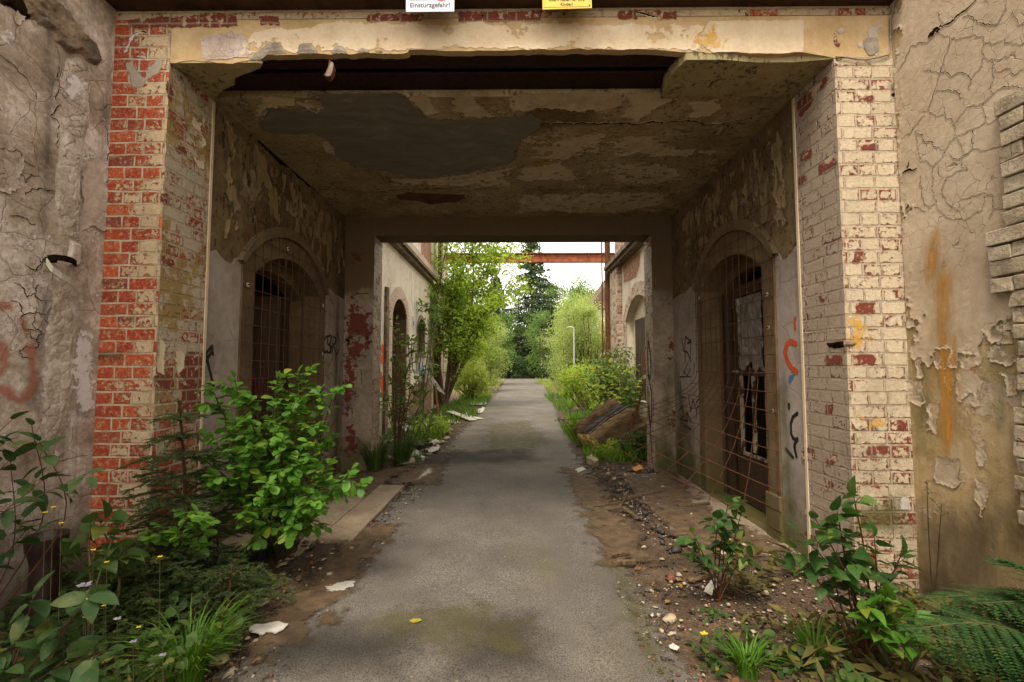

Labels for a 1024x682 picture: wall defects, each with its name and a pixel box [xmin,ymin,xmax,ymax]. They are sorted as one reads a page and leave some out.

peeling [128,9,804,61]
crack [0,55,63,149]
peeling [255,96,323,121]
peeling [409,91,495,119]
crack [898,0,1024,220]
crack [0,147,56,226]
peeling [223,117,346,275]
peeling [678,130,837,265]
peeling [891,0,1024,436]
crack [11,255,49,359]
flaking render [341,293,374,460]
flaking render [974,439,989,517]